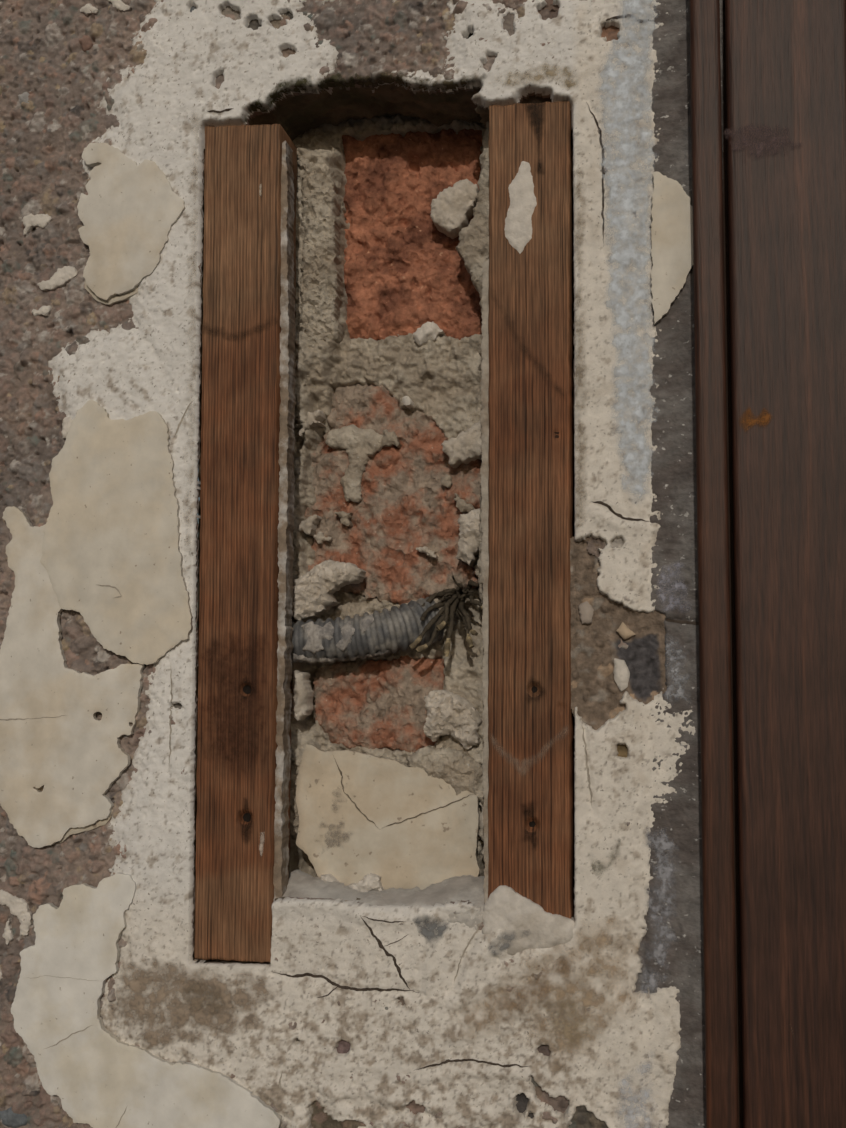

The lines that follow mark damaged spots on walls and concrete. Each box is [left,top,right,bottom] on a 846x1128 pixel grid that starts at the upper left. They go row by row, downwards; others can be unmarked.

crack [594,501,651,522]
spalling [570,536,667,730]
spalling [617,744,628,758]
crack [334,758,473,829]
crack [275,916,418,998]
crack [454,922,482,981]
crack [416,1059,528,1070]